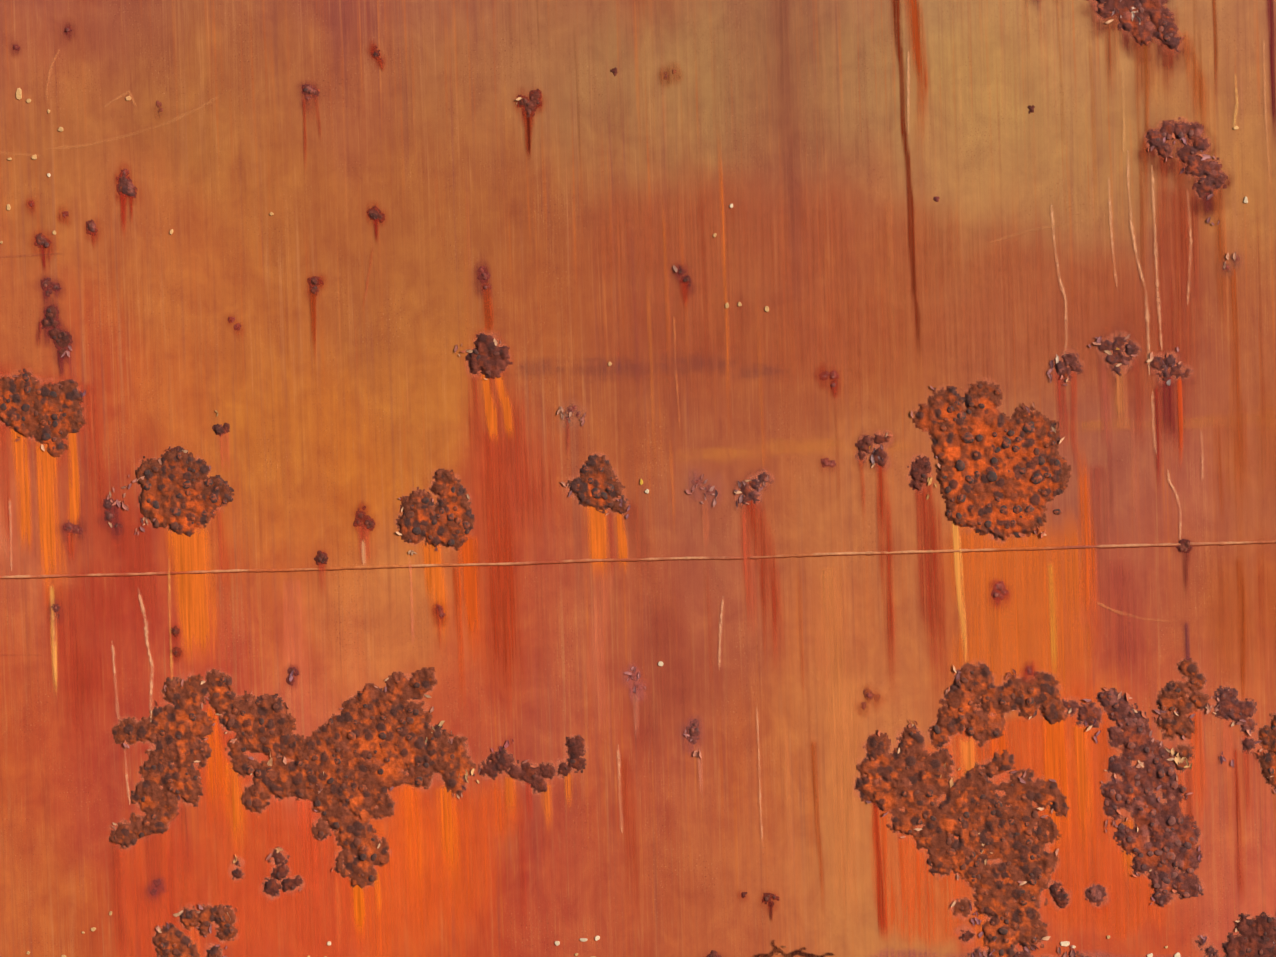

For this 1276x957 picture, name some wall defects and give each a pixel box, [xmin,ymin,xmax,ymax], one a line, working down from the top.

rust [893,0,927,334]
rust [1086,0,1243,457]
rust [0,233,234,681]
rust [396,266,635,677]
rust [907,278,1193,645]
rust [152,904,238,957]
rust [109,666,587,928]
rust [854,590,1276,957]